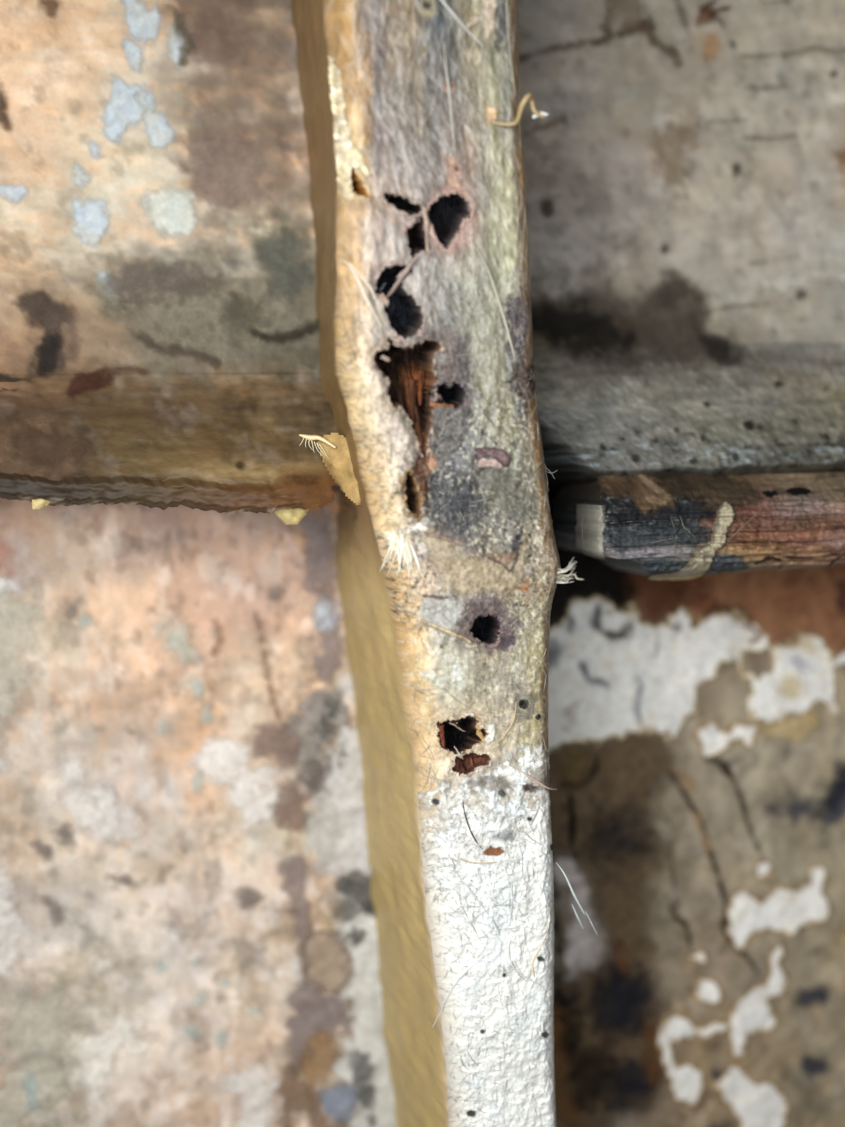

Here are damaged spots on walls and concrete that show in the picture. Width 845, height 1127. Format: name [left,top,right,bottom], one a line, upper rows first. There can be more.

crack [519,41,594,62]
water stain [501,272,774,399]
peeling [548,596,845,758]
water stain [467,733,672,1127]
peeling [553,858,610,980]
crack [668,771,759,974]
crack [710,758,764,862]
peeling [657,861,831,1127]